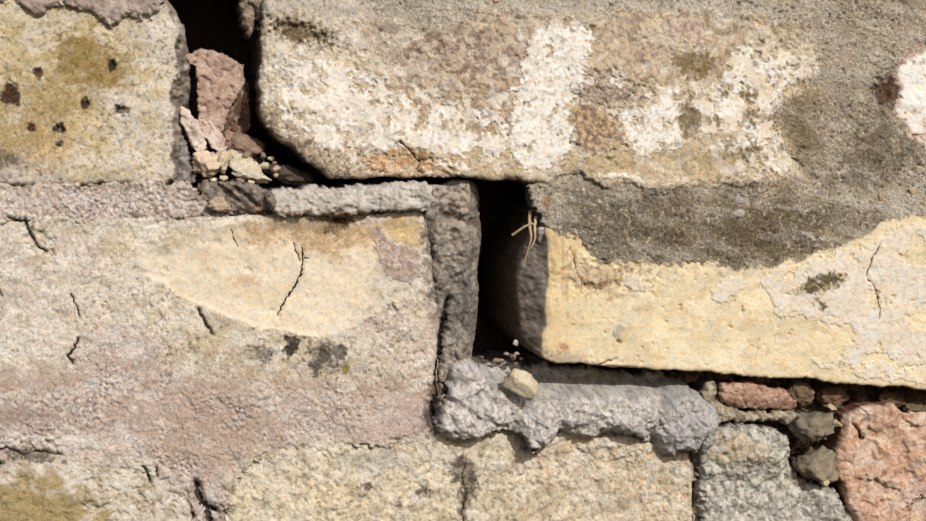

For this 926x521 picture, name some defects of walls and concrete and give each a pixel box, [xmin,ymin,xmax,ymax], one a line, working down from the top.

peeling [180,106,228,151]
crack [8,217,47,252]
crack [277,242,309,316]
crack [67,294,80,364]
crack [197,308,213,334]
crack [429,298,449,420]